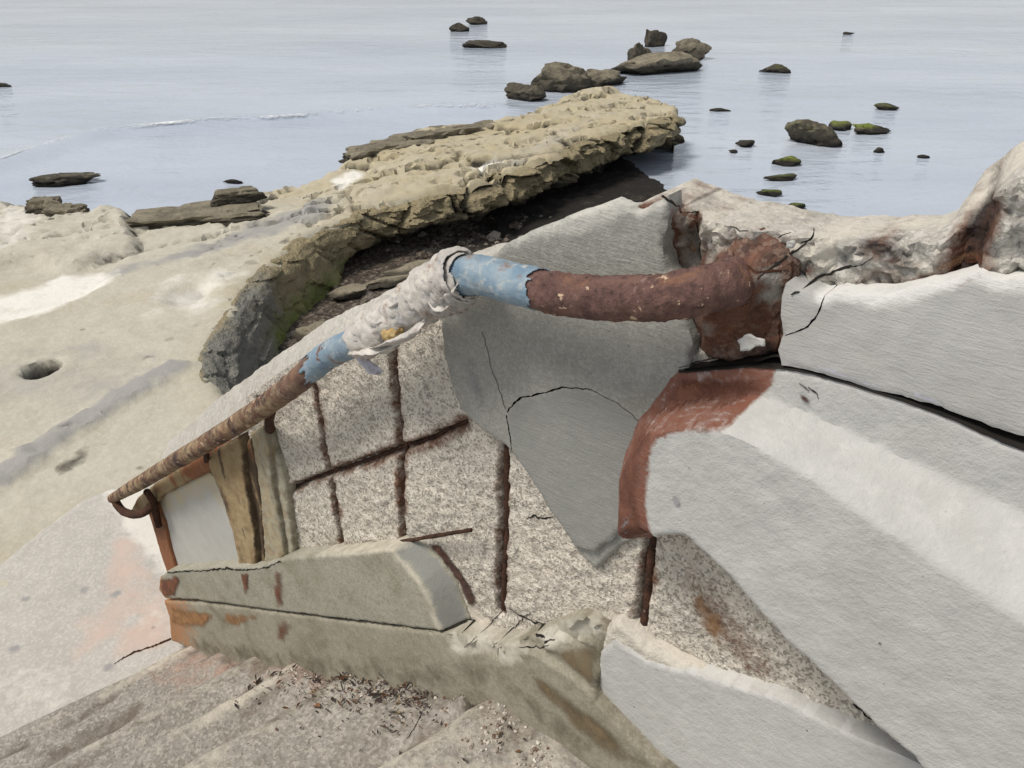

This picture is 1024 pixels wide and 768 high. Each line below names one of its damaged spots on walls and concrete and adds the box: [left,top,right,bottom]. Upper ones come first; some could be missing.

rust [682,210,702,225]
spalling [637,141,1024,286]
crack [678,226,1024,451]
crack [482,334,638,450]
rust [659,382,758,414]
rust [618,425,652,539]
spalling [246,319,881,729]
rust [161,576,179,596]
rust [431,545,475,605]
rust [172,609,209,627]
crack [221,602,555,654]